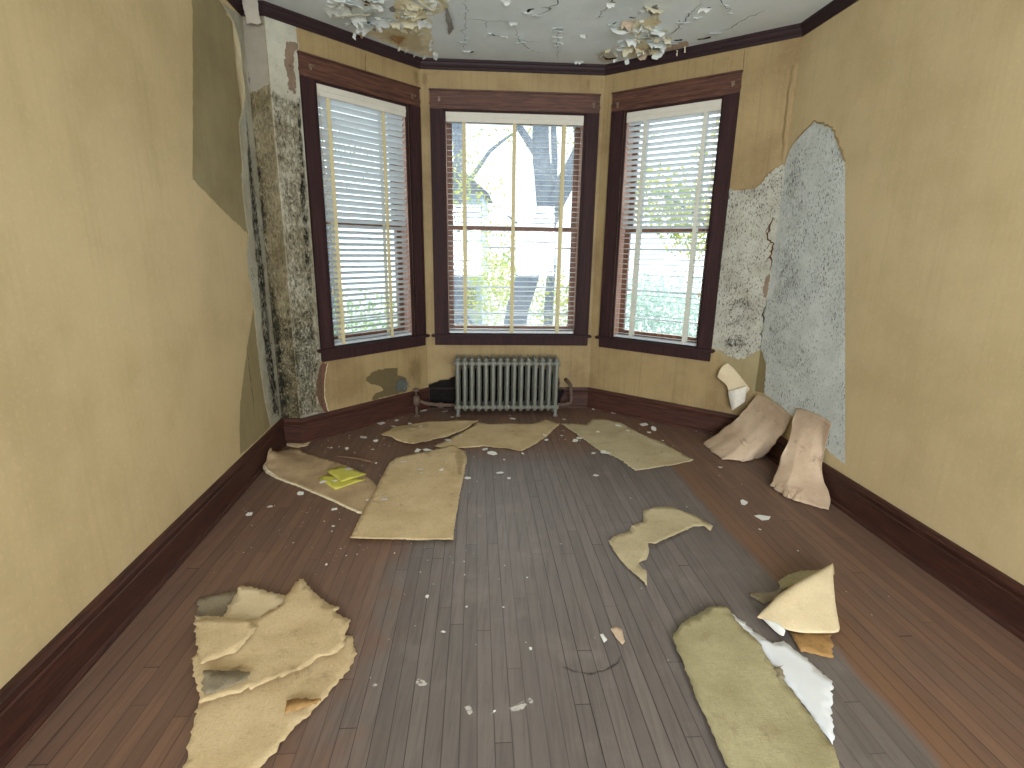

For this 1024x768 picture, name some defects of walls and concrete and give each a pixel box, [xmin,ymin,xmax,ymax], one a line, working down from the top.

peeling [322,0,454,60]
crack [458,0,564,53]
peeling [608,5,711,65]
crack [666,0,757,38]
flaking render [220,0,329,426]
damp [246,86,323,418]
crack [765,217,774,268]
flaking render [712,120,846,464]